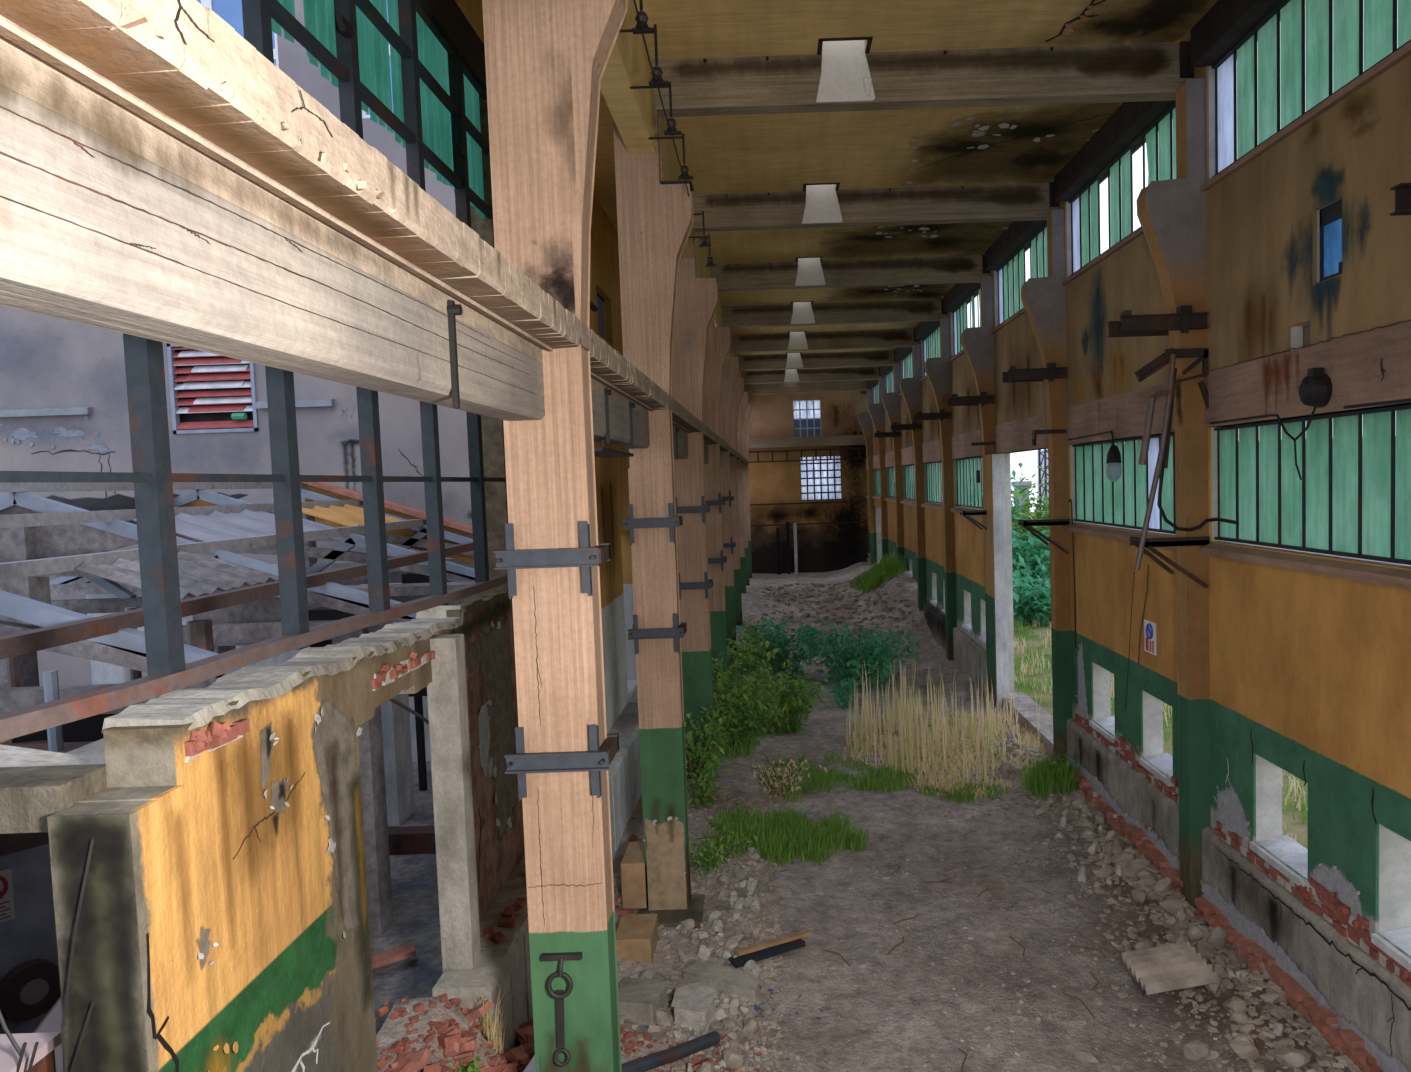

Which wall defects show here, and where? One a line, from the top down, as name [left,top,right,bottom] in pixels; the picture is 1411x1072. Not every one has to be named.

crack [175,0,215,45]
water stain [678,0,1194,102]
water stain [555,276,575,309]
water stain [707,106,1099,382]
water stain [1314,171,1368,257]
spalling [184,719,293,833]
spalling [1075,640,1179,804]
crack [146,933,179,1072]
crack [292,1022,330,1072]
spalling [1200,880,1411,1072]
spalling [1214,783,1411,988]
crack [1218,849,1411,1058]